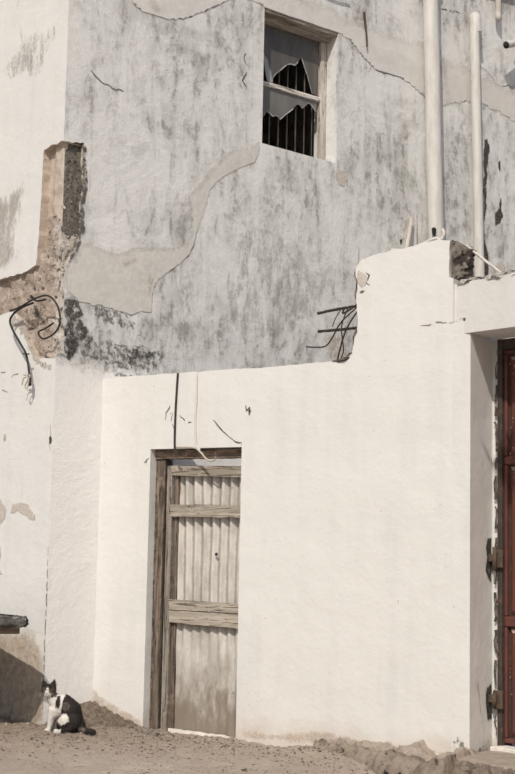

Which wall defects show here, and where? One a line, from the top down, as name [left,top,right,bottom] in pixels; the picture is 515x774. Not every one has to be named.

damp [483,139,503,225]
spalling [0,142,82,370]
spalling [354,271,367,300]
damp [64,299,163,377]
peeling [0,501,35,523]